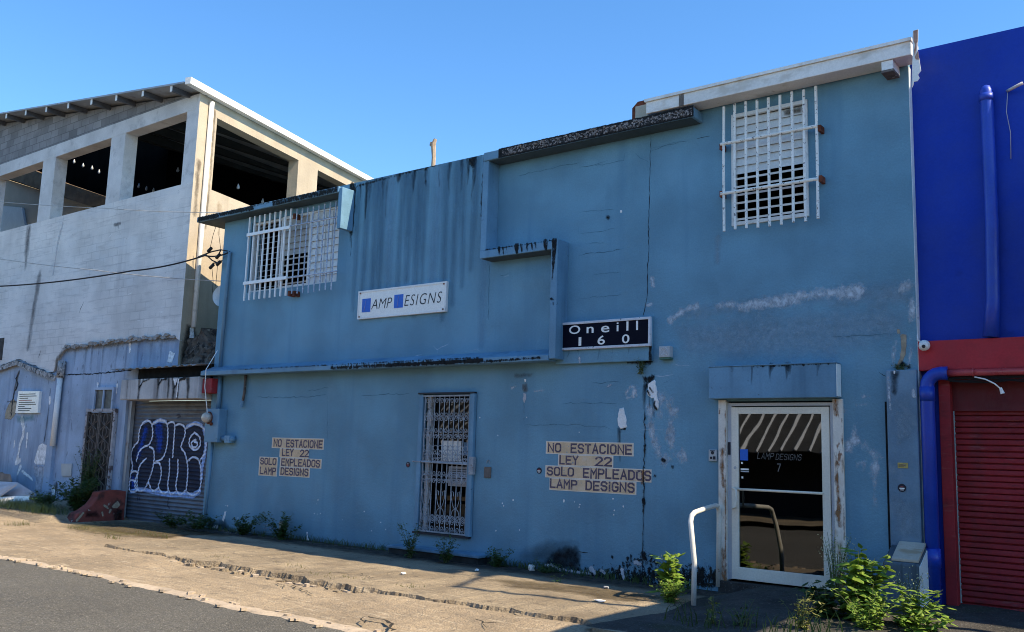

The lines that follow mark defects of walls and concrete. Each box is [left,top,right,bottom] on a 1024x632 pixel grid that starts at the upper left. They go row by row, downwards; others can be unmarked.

damp [349,157,484,235]
damp [486,238,557,278]
crack [518,136,708,315]
damp [720,285,864,309]
peeling [618,408,627,442]
peeling [626,375,686,468]
crack [532,411,663,599]